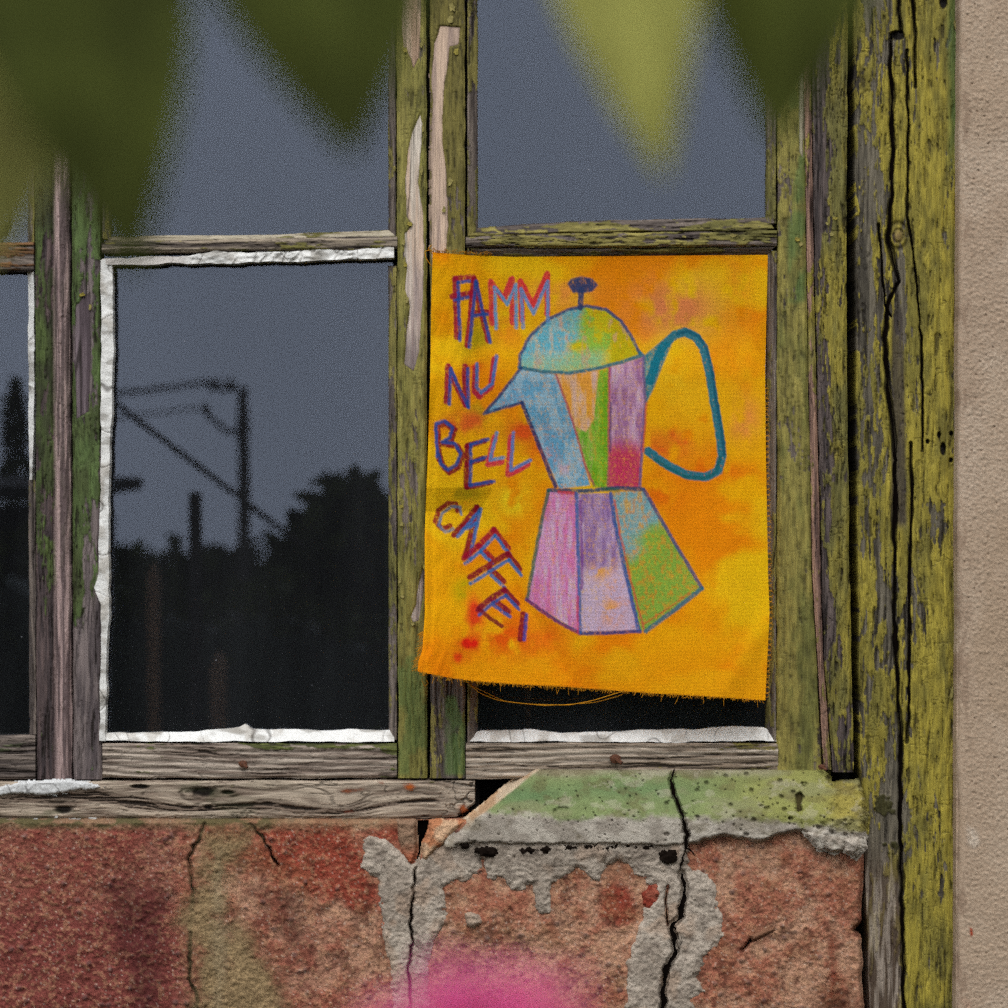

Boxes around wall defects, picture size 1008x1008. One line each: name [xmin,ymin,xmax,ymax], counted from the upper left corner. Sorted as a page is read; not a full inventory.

peeling [402,2,460,371]
crack [878,0,923,1008]
spalling [395,818,466,864]
spalling [460,843,498,857]
spalling [519,845,551,855]
spalling [564,844,677,865]
spalling [802,830,868,861]
spalling [642,884,660,908]
crack [660,769,695,1008]
crack [407,869,416,1004]